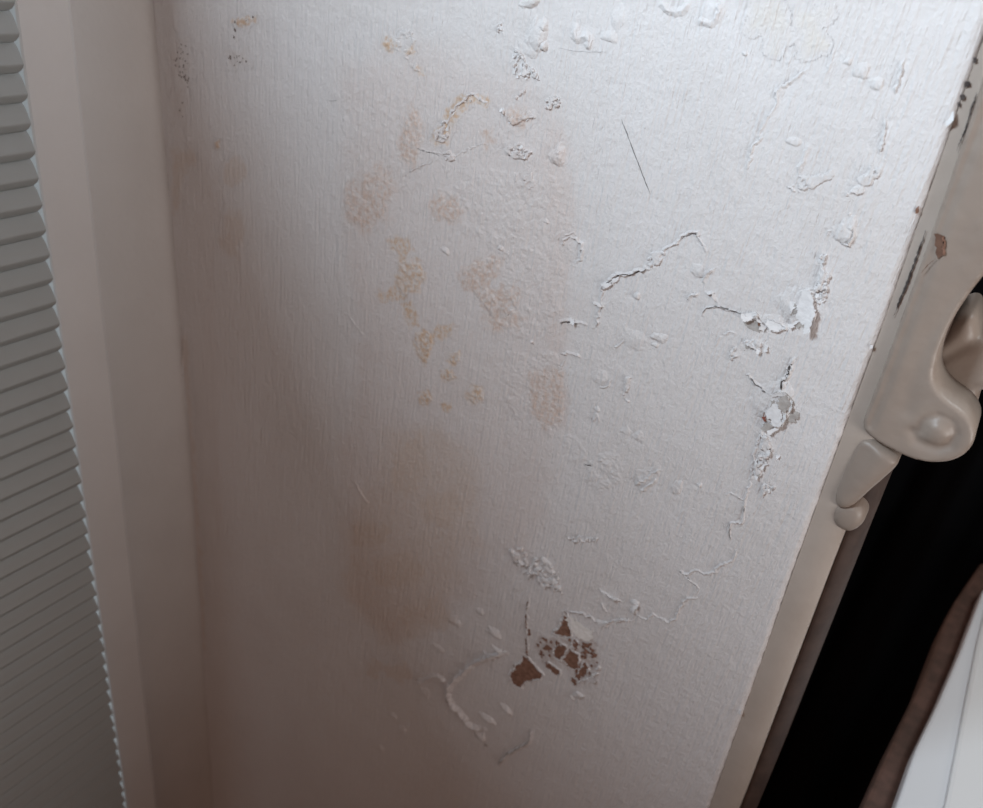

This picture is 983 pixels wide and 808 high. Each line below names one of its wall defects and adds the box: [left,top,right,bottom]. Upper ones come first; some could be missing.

peeling [428,90,535,149]
peeling [504,143,532,160]
damp [325,14,612,657]
crack [591,229,701,329]
crack [701,305,741,317]
crack [745,356,796,393]
peeling [740,254,832,355]
peeling [748,380,799,497]
crack [636,430,764,624]
flaking render [413,588,639,746]